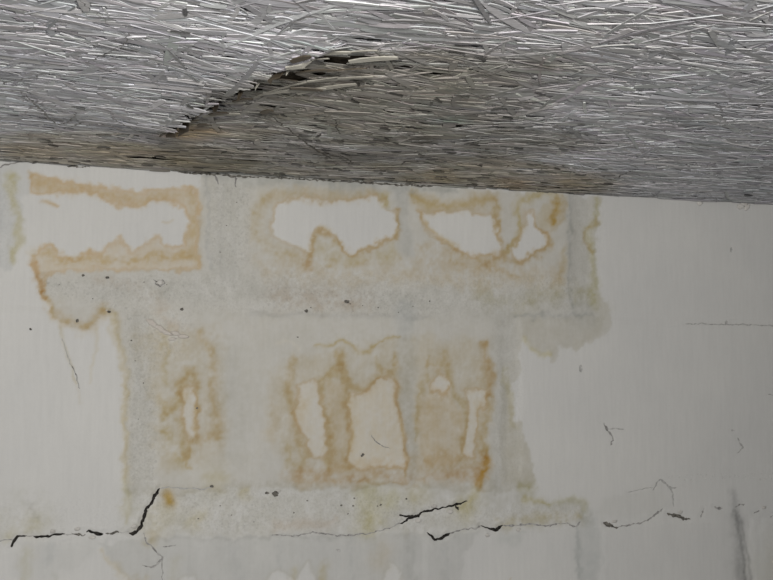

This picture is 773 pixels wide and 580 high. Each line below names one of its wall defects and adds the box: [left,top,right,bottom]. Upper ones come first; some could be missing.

water stain [0,38,618,172]
water stain [0,155,673,580]
crack [0,486,211,580]
crack [275,501,580,541]
crack [603,479,773,529]